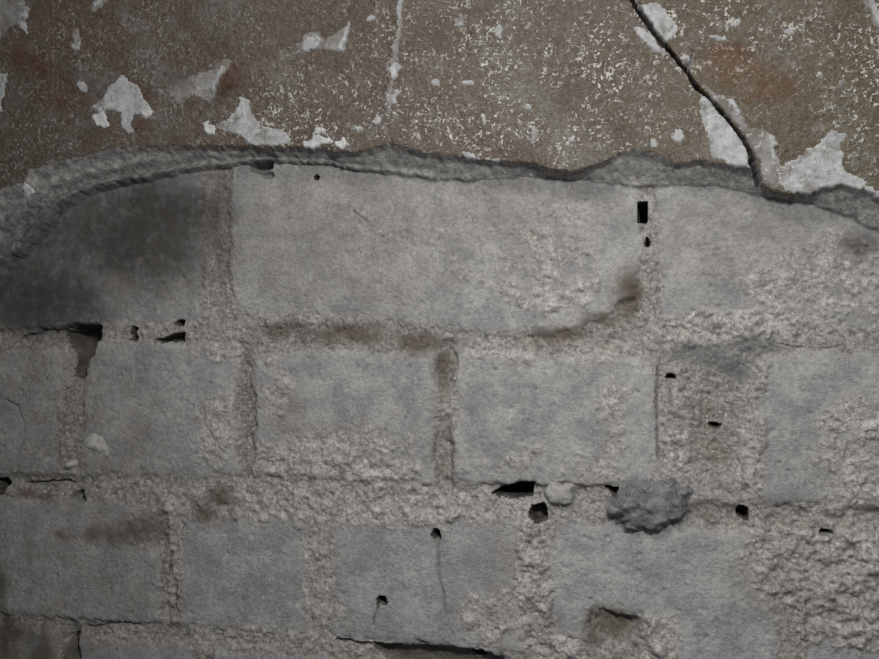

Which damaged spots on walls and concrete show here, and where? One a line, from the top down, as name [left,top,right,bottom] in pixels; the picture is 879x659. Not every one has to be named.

peeling [296,20,350,53]
peeling [633,2,678,54]
peeling [91,59,232,134]
peeling [202,97,291,148]
peeling [303,127,333,152]
peeling [672,129,684,142]
crack [630,0,762,188]
peeling [699,86,783,188]
peeling [778,129,867,198]
leakage [0,190,202,326]
spalling [0,143,879,659]